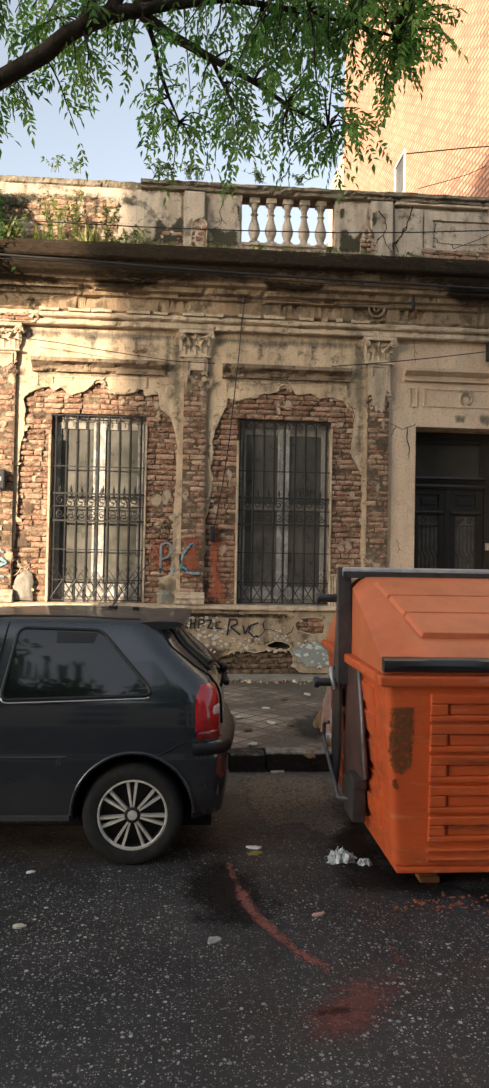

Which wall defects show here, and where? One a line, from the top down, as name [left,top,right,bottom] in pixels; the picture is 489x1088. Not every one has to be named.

flaking render [3,188,119,243]
flaking render [0,359,393,675]